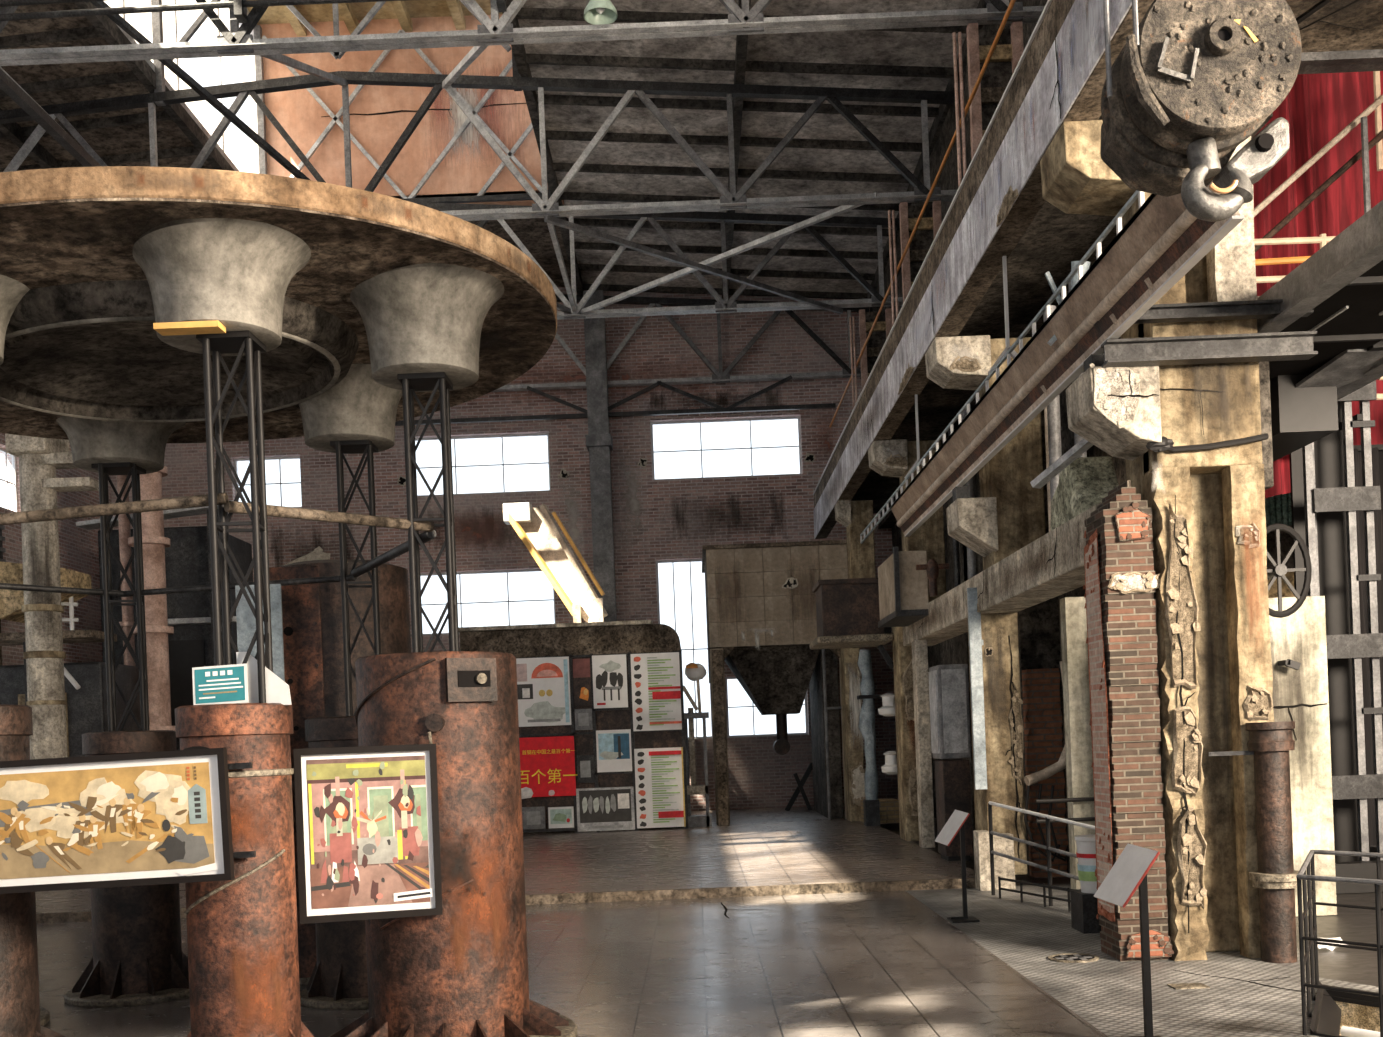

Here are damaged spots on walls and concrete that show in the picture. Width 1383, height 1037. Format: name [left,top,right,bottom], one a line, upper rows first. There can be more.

peeling [1083,501,1201,922]
crack [1173,495,1195,933]
crack [1273,703,1327,740]
corrosion [231,812,263,840]
spalling [1171,706,1207,909]
corrosion [451,851,504,957]
spalling [1126,928,1174,959]
crack [1175,970,1376,1003]